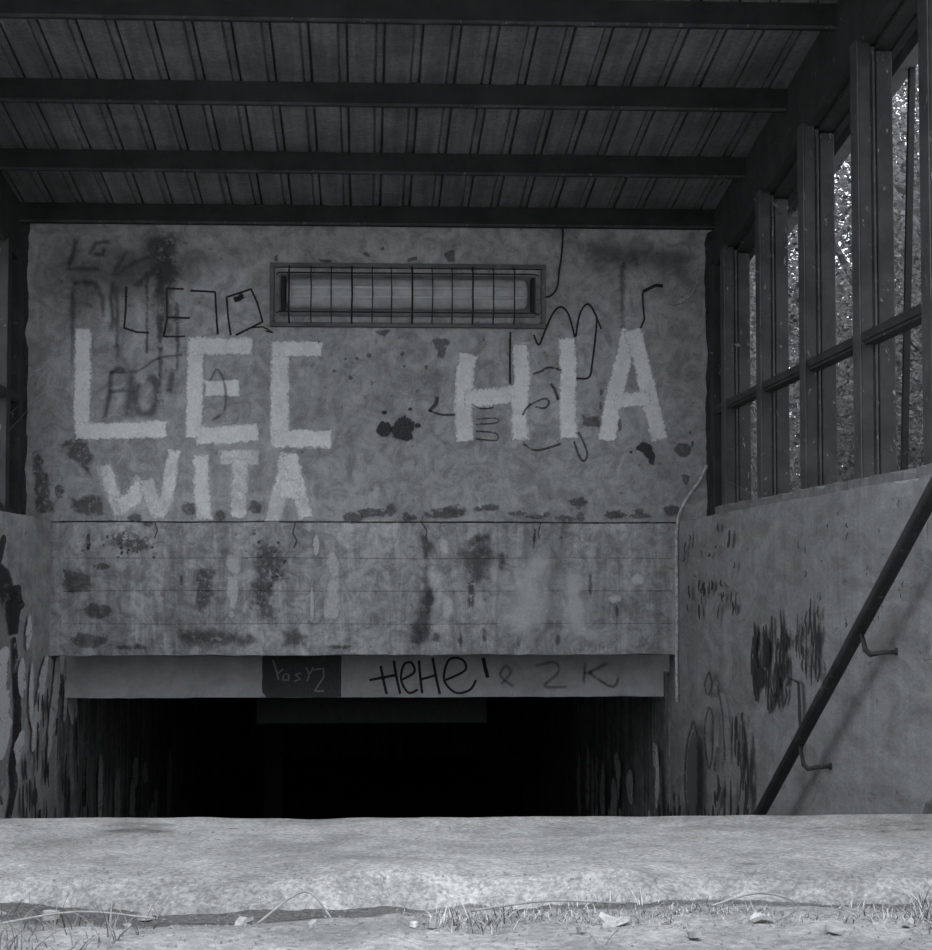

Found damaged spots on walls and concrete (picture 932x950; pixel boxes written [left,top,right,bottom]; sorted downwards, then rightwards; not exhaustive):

water stain [180,630,254,646]
water stain [226,557,241,618]
water stain [285,631,304,644]
water stain [310,535,339,621]
water stain [411,581,453,643]
water stain [423,537,448,558]
water stain [462,536,504,607]
water stain [504,555,548,645]
water stain [565,574,609,639]